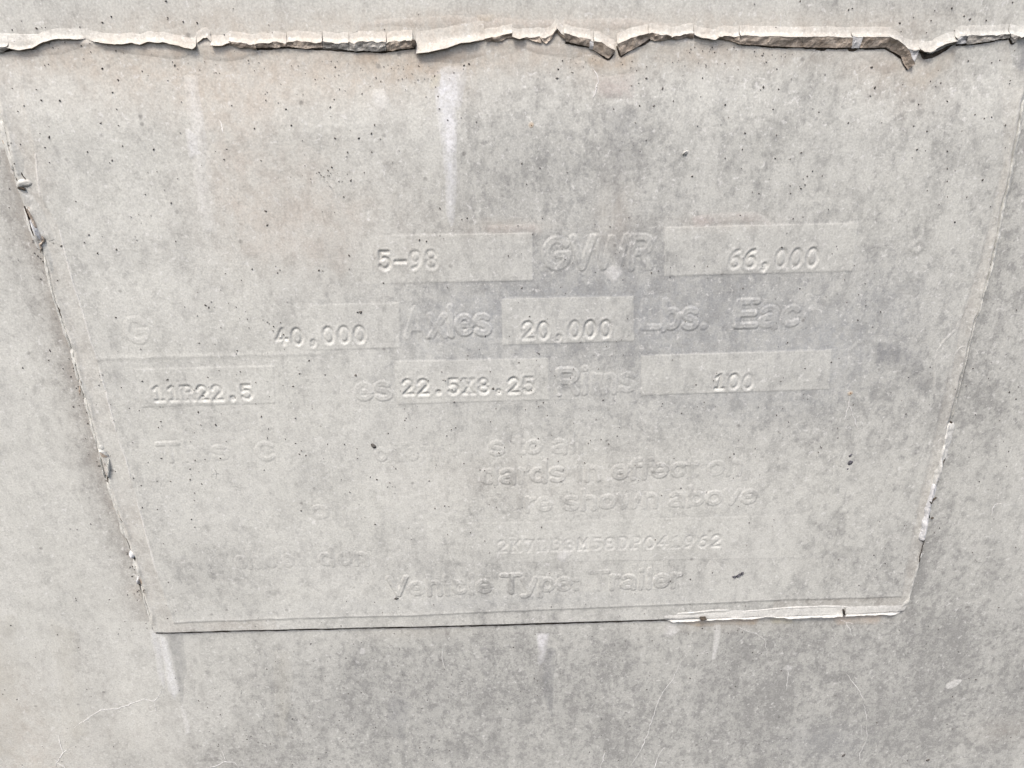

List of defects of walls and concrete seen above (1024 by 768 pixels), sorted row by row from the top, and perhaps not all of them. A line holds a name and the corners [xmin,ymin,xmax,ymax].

peeling [0,18,1024,70]
peeling [919,421,955,562]
peeling [664,605,906,623]